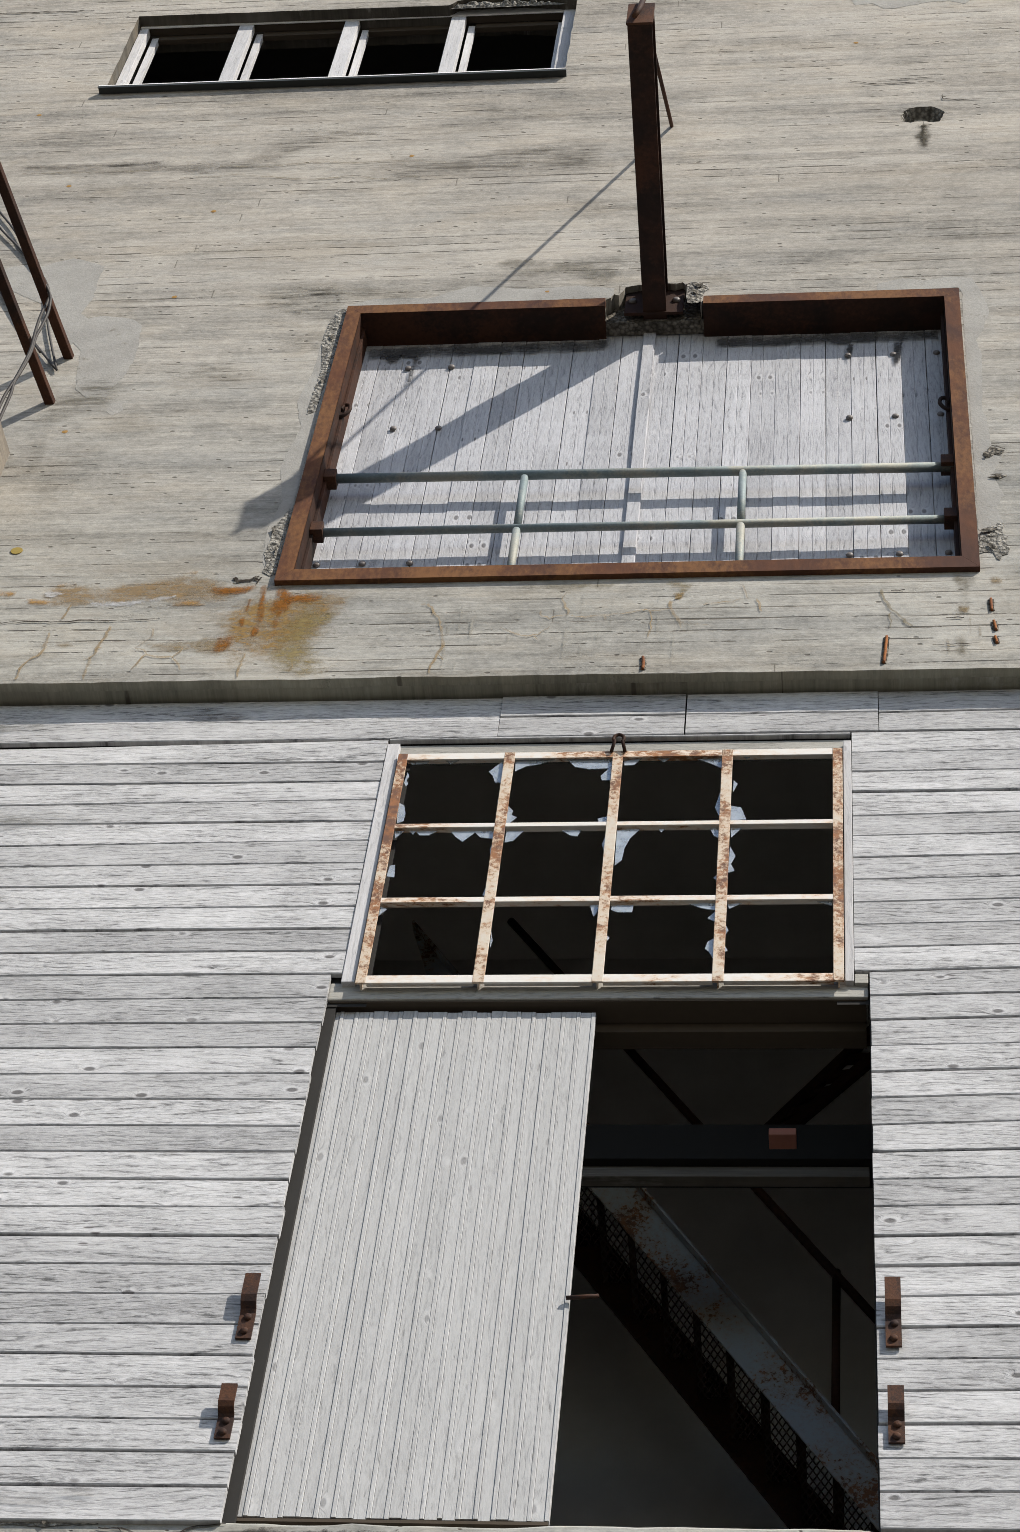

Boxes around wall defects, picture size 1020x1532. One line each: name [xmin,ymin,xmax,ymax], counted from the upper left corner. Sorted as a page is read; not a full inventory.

rust [30,580,330,670]